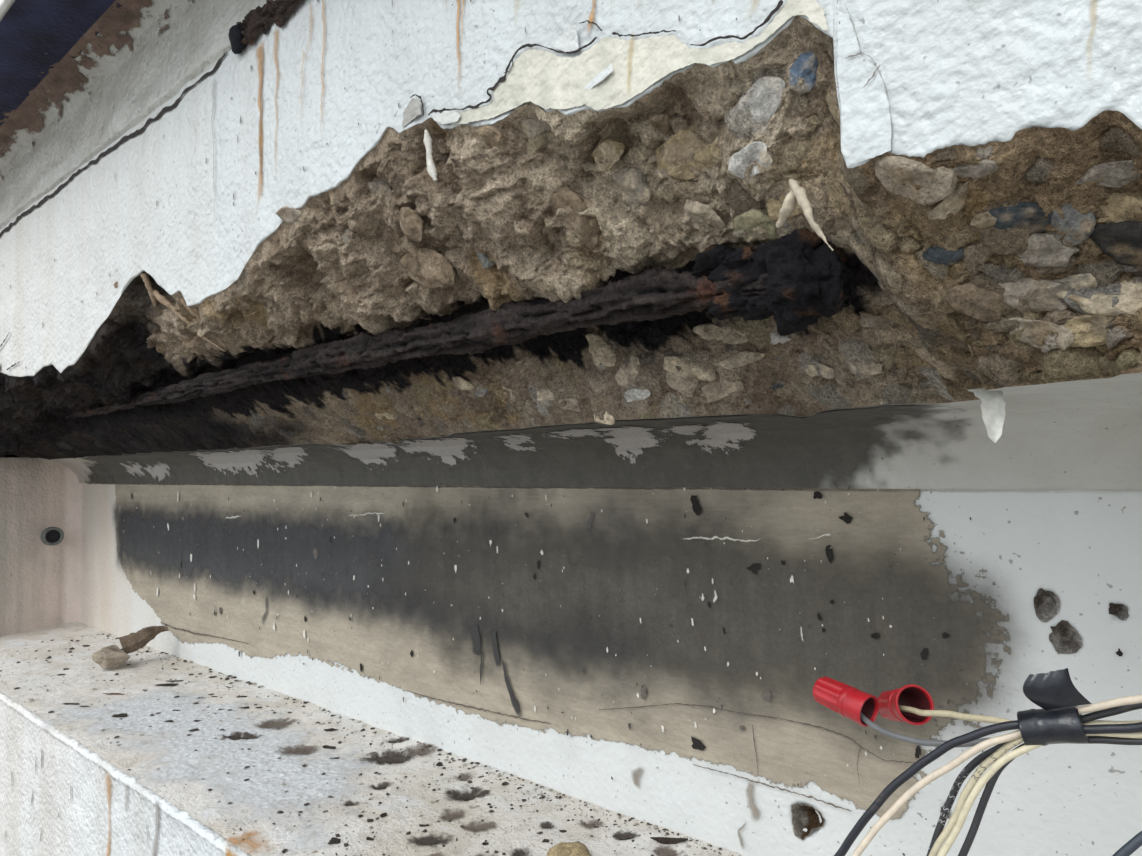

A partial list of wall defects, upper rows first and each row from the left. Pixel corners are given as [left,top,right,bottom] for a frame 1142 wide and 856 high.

corrosion [228,0,302,185]
corrosion [456,0,464,64]
crack [410,0,783,116]
crack [837,1,892,148]
spalling [0,0,1142,460]
corrosion [691,229,857,336]
damp [115,508,997,728]
damp [45,690,366,816]
corrosion [227,832,258,856]